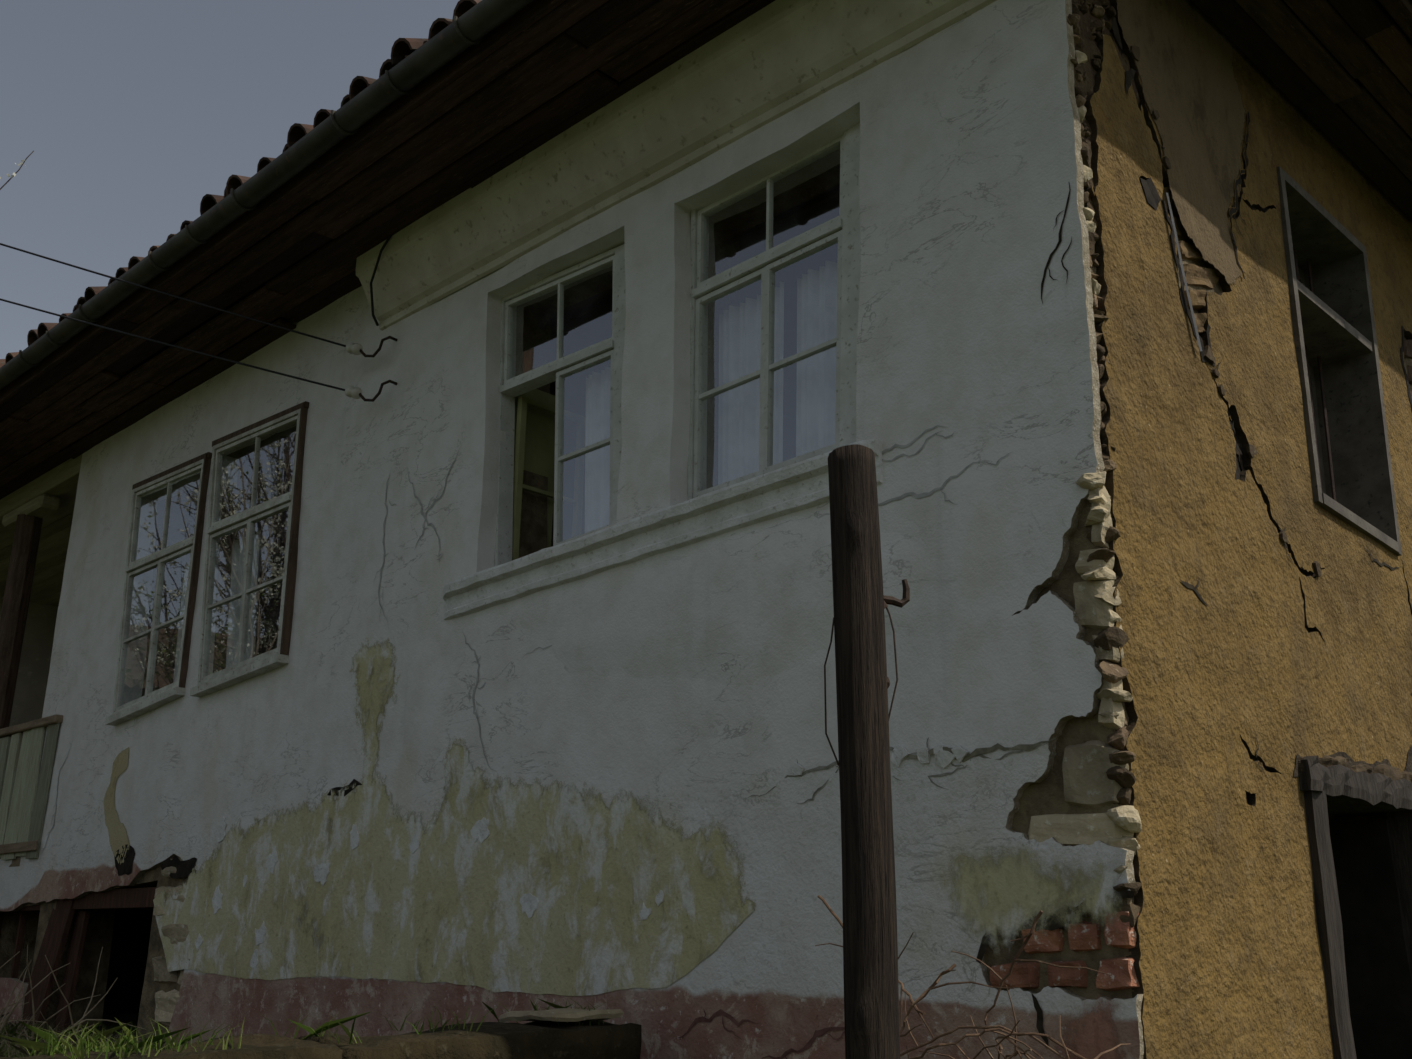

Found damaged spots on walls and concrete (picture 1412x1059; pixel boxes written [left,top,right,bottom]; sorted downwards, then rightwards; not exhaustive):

crack [1103,5,1171,169]
crack [1041,183,1072,304]
flaking render [1400,326,1412,405]
crack [1204,345,1258,471]
crack [878,425,1009,506]
flaking render [976,0,1250,1059]
crack [1279,528,1322,577]
crack [1364,547,1401,570]
crack [744,760,839,804]
crack [890,737,1056,789]
crack [1249,741,1270,772]
damp [951,848,1121,943]